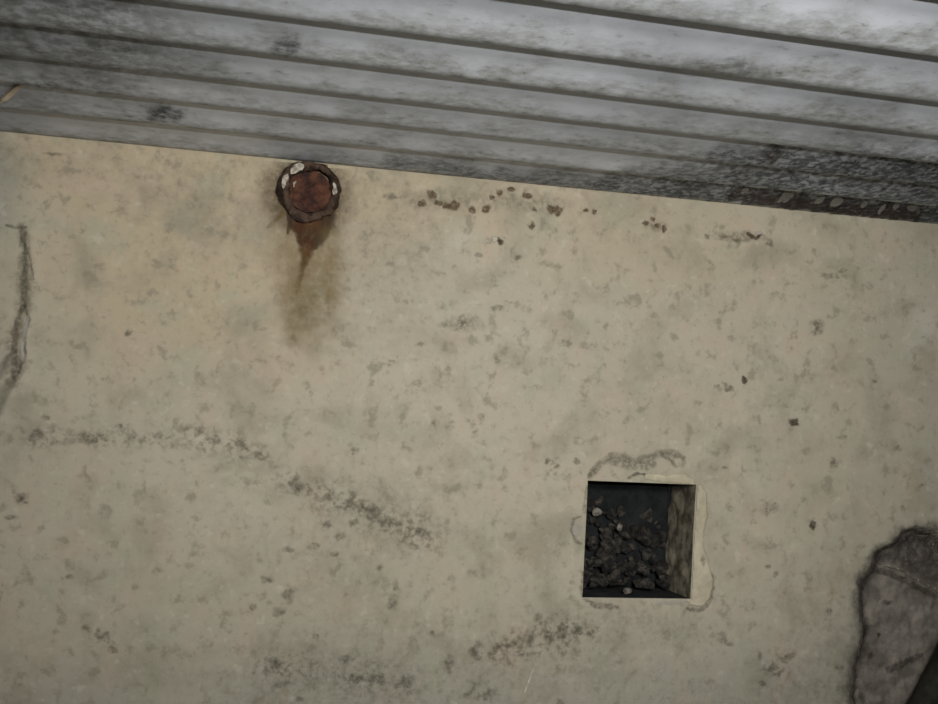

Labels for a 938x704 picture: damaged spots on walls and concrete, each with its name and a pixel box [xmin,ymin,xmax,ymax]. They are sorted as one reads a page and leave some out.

rust [268,168,342,271]
rust [418,187,531,212]
spalling [850,525,938,704]